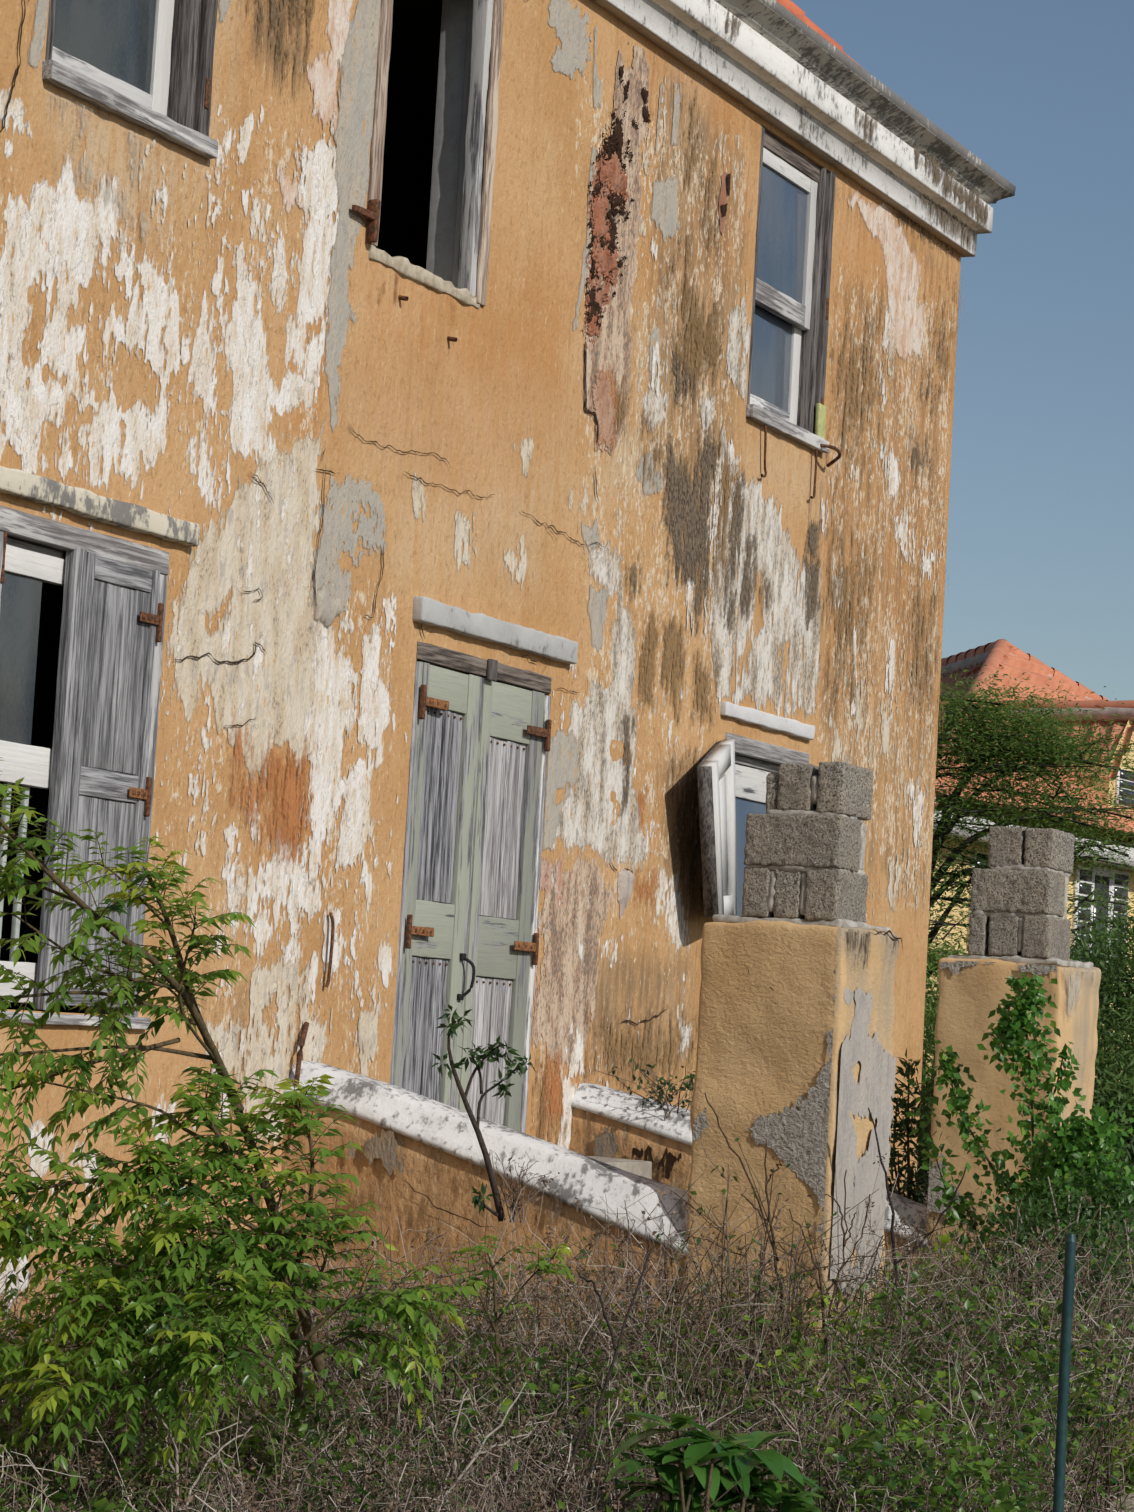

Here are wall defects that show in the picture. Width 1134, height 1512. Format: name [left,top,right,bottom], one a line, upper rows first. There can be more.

crack [0,0,30,133]
damp [709,0,741,48]
damp [893,144,990,257]
peeling [0,0,407,1151]
crack [174,641,266,664]
crack [314,419,605,600]
damp [613,89,772,815]
peeling [532,0,947,1149]
damp [804,286,890,727]
rust [232,722,319,860]
peeling [24,1120,102,1205]
peeling [748,969,896,1293]